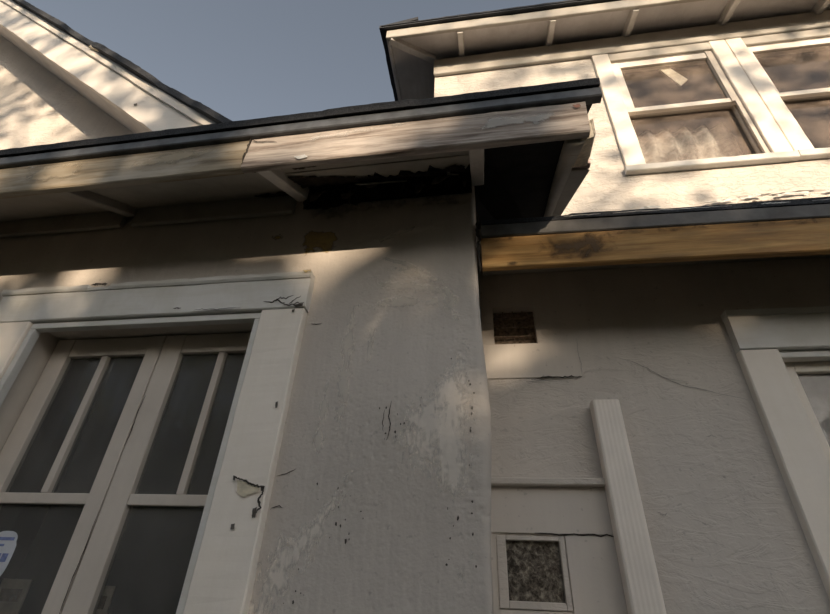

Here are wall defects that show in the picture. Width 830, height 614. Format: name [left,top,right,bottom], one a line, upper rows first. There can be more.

crack [264,295,304,312]
crack [528,345,582,382]
spalling [233,476,265,518]
crack [538,531,614,539]